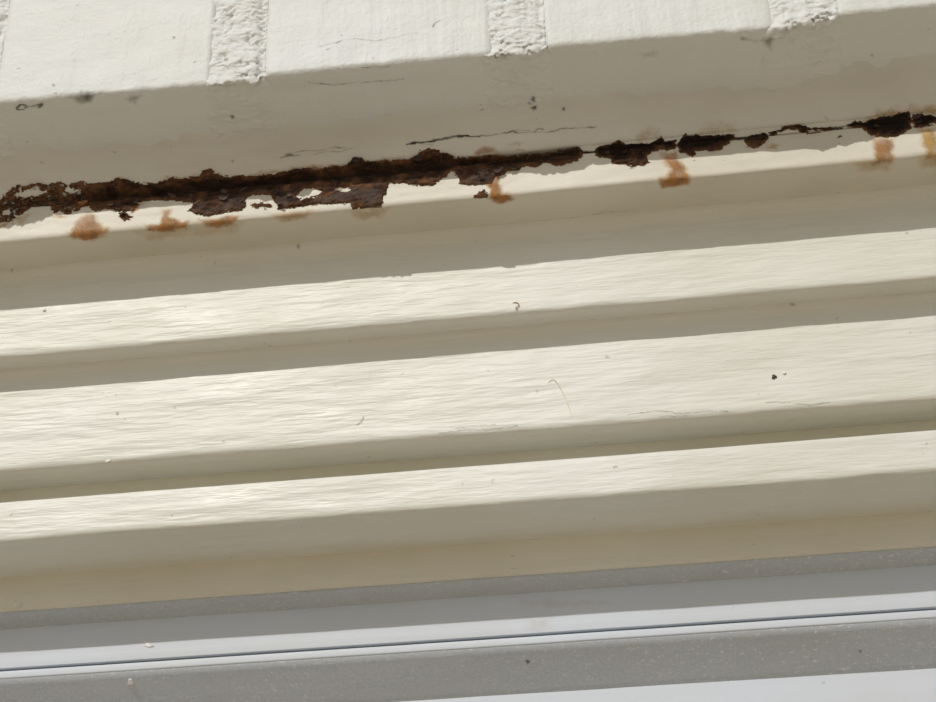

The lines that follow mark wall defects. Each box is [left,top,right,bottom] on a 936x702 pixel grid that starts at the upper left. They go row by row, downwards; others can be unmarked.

rust [875,140,892,163]
rust [923,130,936,158]
rust [661,156,688,188]
rust [487,177,512,203]
rust [72,217,106,240]
rust [149,212,187,232]
rust [205,216,237,227]